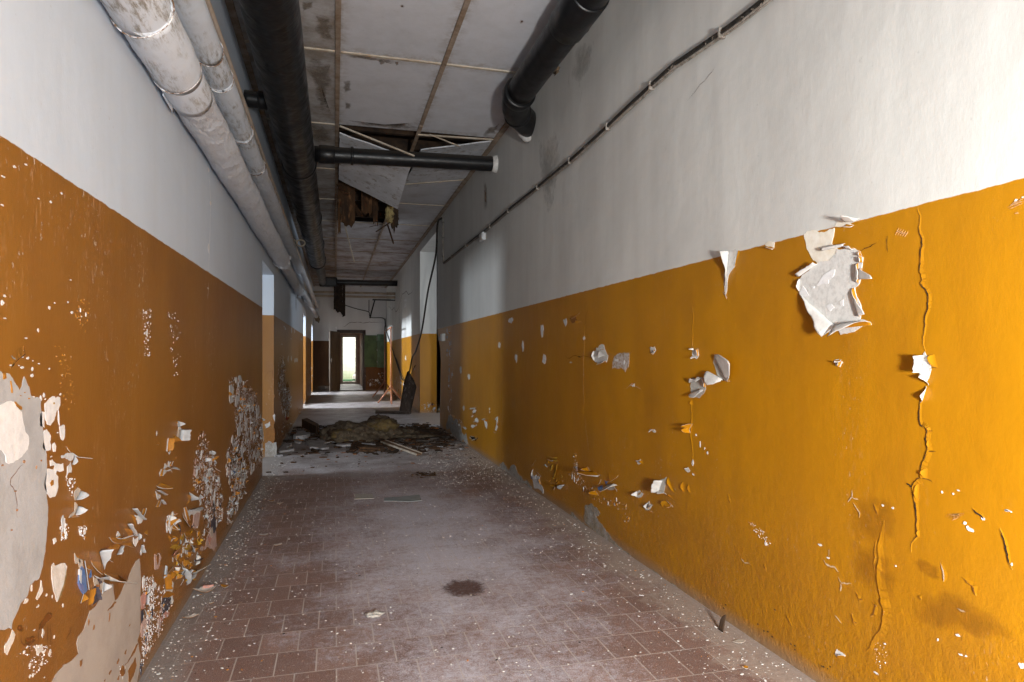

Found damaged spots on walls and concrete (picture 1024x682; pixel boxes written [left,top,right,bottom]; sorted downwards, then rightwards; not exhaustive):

peeling [719,249,740,299]
peeling [795,215,888,337]
peeling [591,344,637,388]
peeling [688,354,730,398]
crack [906,210,938,553]
flaking render [0,357,307,682]
spalling [500,455,691,556]
water stain [444,580,483,596]